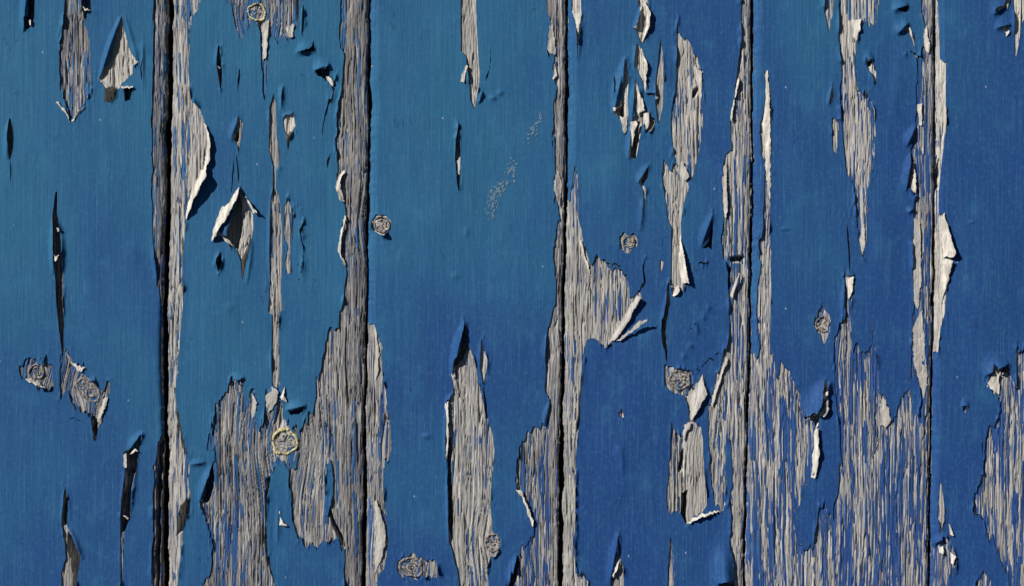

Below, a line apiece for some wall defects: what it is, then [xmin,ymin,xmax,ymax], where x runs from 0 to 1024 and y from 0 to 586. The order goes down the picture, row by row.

peeling [56,0,138,124]
peeling [460,0,480,109]
peeling [613,0,703,297]
peeling [19,349,110,441]
peeling [61,487,80,586]
peeling [151,0,439,586]
peeling [445,323,500,586]
peeling [506,0,647,586]
peeling [664,0,957,586]
peeling [973,347,1024,586]